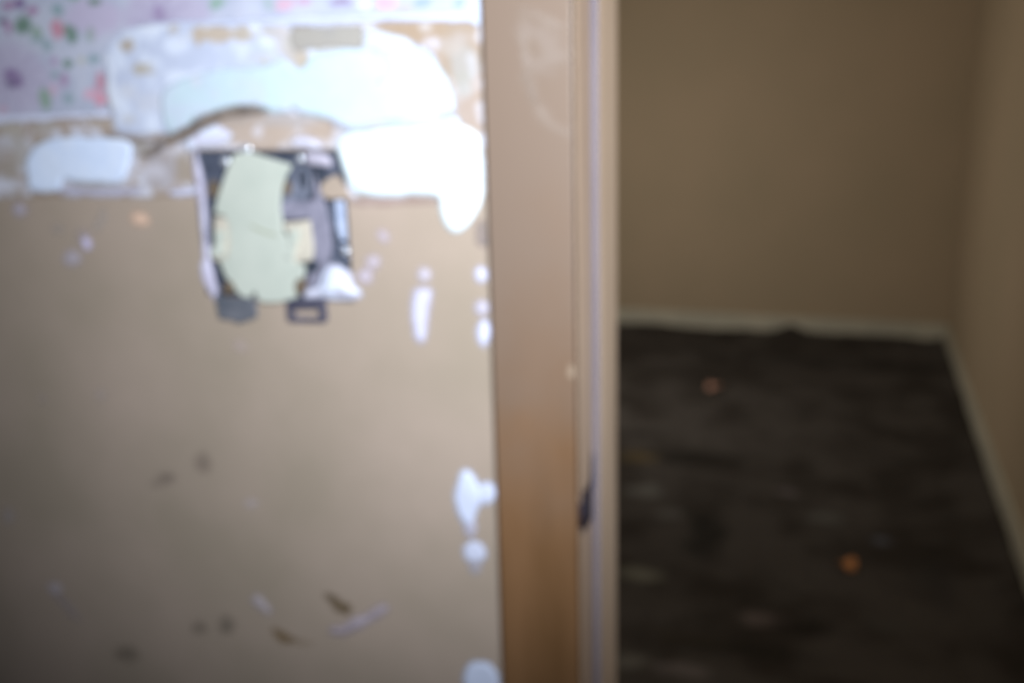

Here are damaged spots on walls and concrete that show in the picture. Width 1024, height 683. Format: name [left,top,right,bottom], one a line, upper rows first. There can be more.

peeling [0,107,364,198]
peeling [289,14,488,199]